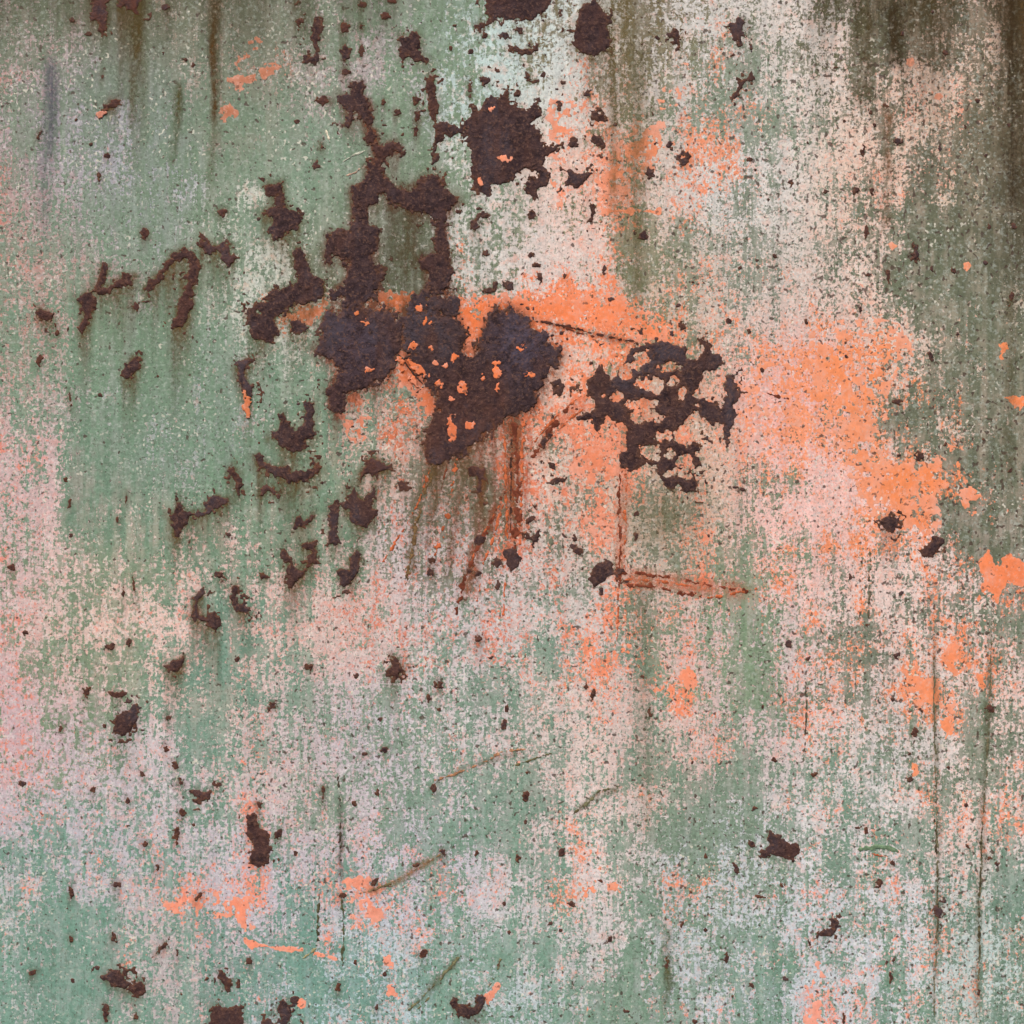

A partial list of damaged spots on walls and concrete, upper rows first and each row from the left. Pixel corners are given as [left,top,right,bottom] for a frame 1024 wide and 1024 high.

corrosion [30,227,245,346]
corrosion [159,0,748,598]
peeling [744,315,981,546]
corrosion [184,571,262,638]
peeling [977,549,1024,604]
peeling [900,641,960,739]
corrosion [238,801,282,868]
corrosion [748,830,800,863]
peeling [157,891,337,961]
corrosion [91,962,150,1000]